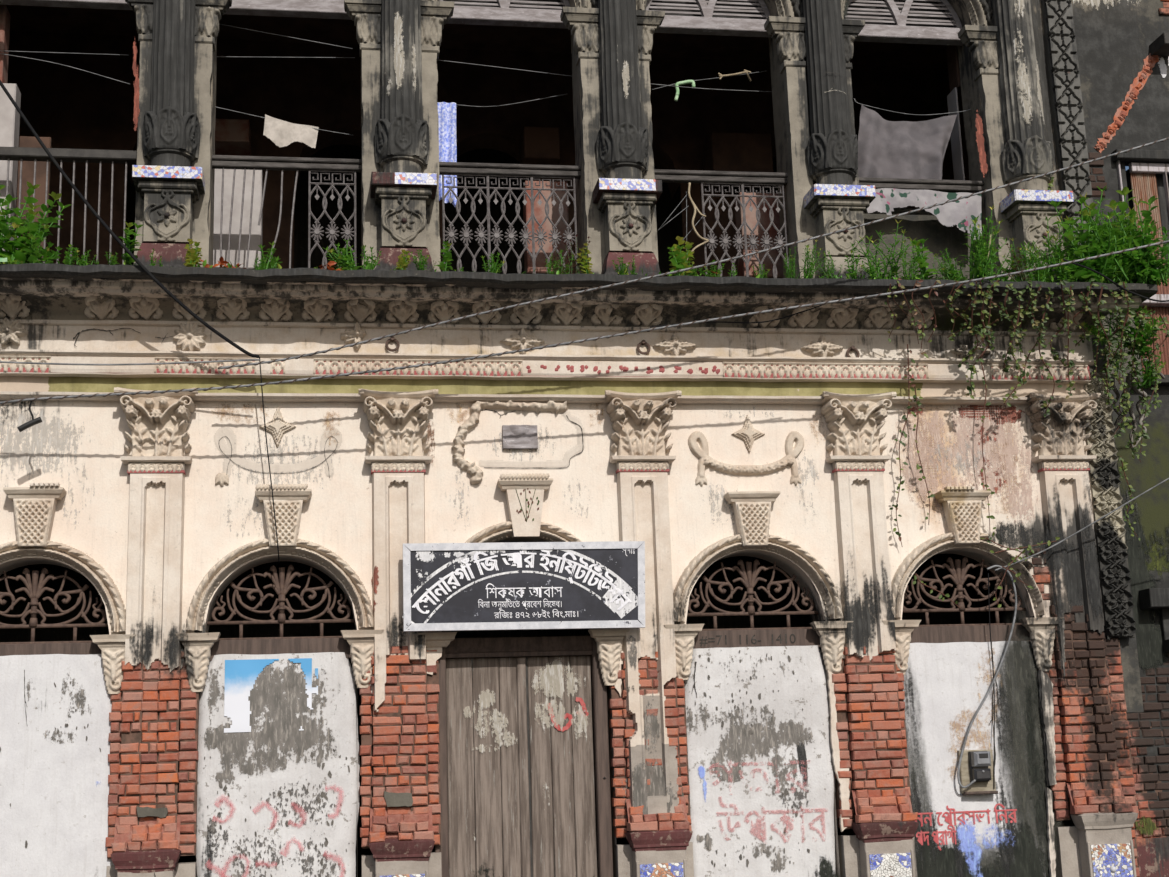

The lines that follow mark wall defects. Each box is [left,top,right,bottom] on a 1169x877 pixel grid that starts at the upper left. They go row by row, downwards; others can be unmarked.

flaking render [1073,0,1137,10]
flaking render [1158,0,1169,15]
leakage [986,443,1103,632]
leakage [1122,484,1169,672]
peeling [43,675,91,744]
flaking render [99,646,442,877]
peeling [532,657,588,738]
flaking render [608,650,813,872]
flaking render [827,647,918,832]
flaking render [1030,548,1169,877]